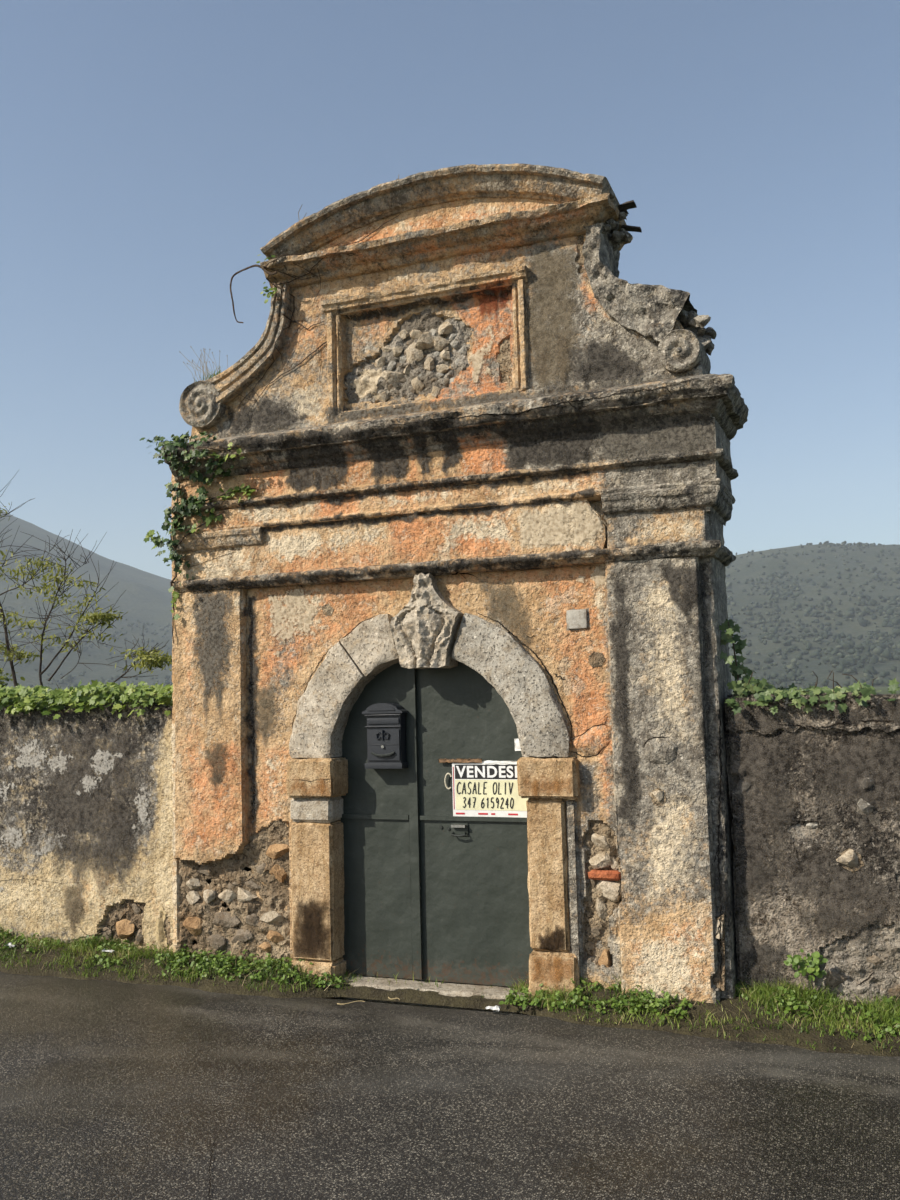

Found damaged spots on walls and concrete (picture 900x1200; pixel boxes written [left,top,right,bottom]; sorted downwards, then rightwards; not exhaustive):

flaking render [576,234,585,274]
spalling [596,190,632,251]
flaking render [343,308,512,404]
damp [175,249,716,533]
damp [187,546,609,827]
damp [610,578,644,834]
damp [41,727,138,873]
flaking render [99,819,291,963]
damp [294,901,331,958]
damp [539,926,567,956]
flaking render [583,821,622,967]
crack [711,707,892,996]